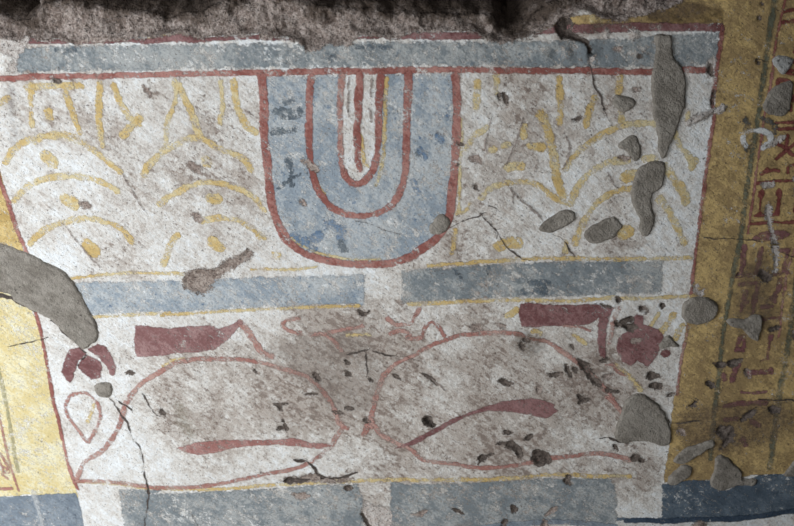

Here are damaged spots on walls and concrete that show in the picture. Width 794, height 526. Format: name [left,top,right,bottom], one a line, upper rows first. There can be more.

flaking render [0,0,686,74]
crack [590,66,612,125]
spalling [186,161,203,174]
crack [450,206,530,261]
flaking render [182,248,254,297]
crack [109,393,161,526]